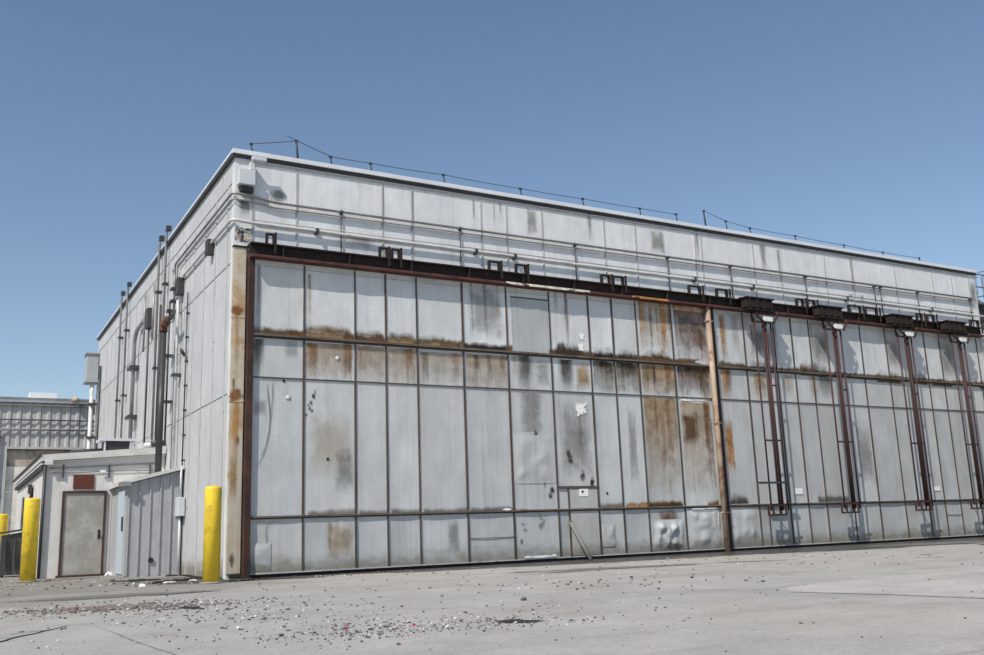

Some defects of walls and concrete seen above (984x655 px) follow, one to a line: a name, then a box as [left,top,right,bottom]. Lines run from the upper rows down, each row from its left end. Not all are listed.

rust [262,327,513,369]
leakage [520,356,530,376]
rust [582,301,710,460]
rust [721,364,801,389]
rust [811,372,979,384]
rust [229,378,243,443]
rust [726,427,735,464]